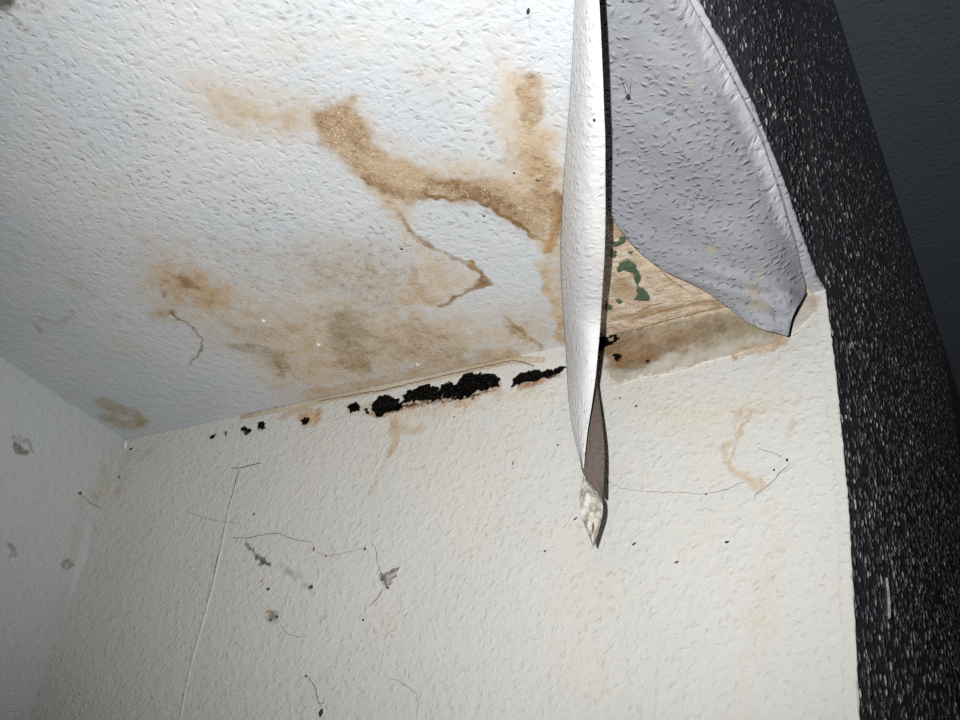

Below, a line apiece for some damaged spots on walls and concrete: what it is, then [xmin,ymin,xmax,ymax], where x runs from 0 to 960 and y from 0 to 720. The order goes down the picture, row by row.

leakage [143,260,233,366]
leakage [204,69,567,458]
flaking render [599,208,730,338]
leakage [597,292,820,387]
leakage [97,399,149,429]
crack [607,448,790,500]
leakage [633,397,767,493]